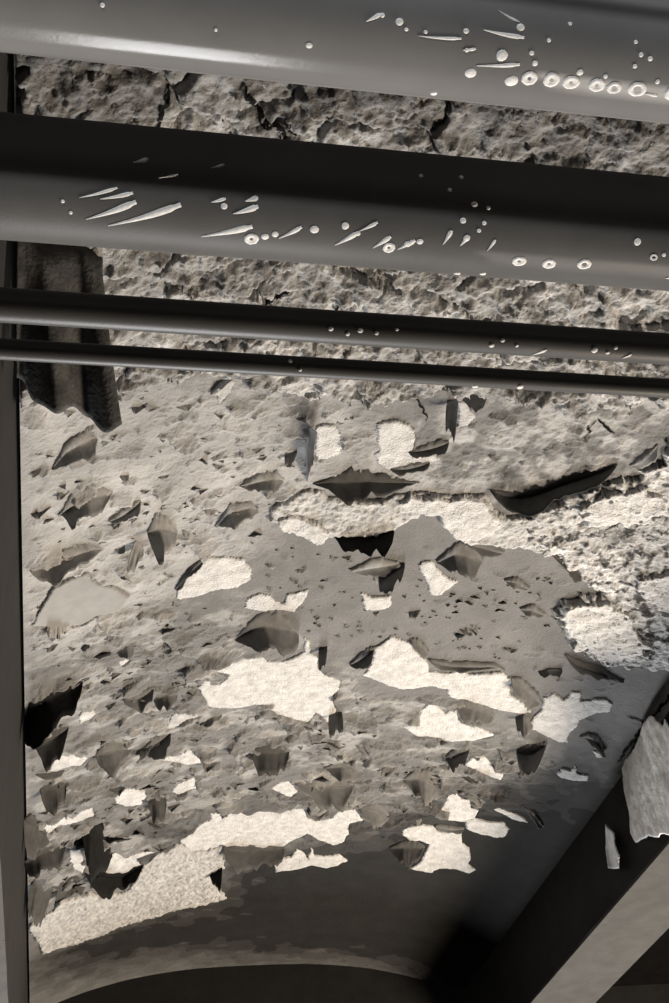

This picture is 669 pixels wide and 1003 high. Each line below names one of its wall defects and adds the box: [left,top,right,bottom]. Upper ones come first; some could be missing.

spalling [15,54,669,177]
spalling [16,241,669,333]
spalling [16,324,669,379]
spalling [16,361,669,955]